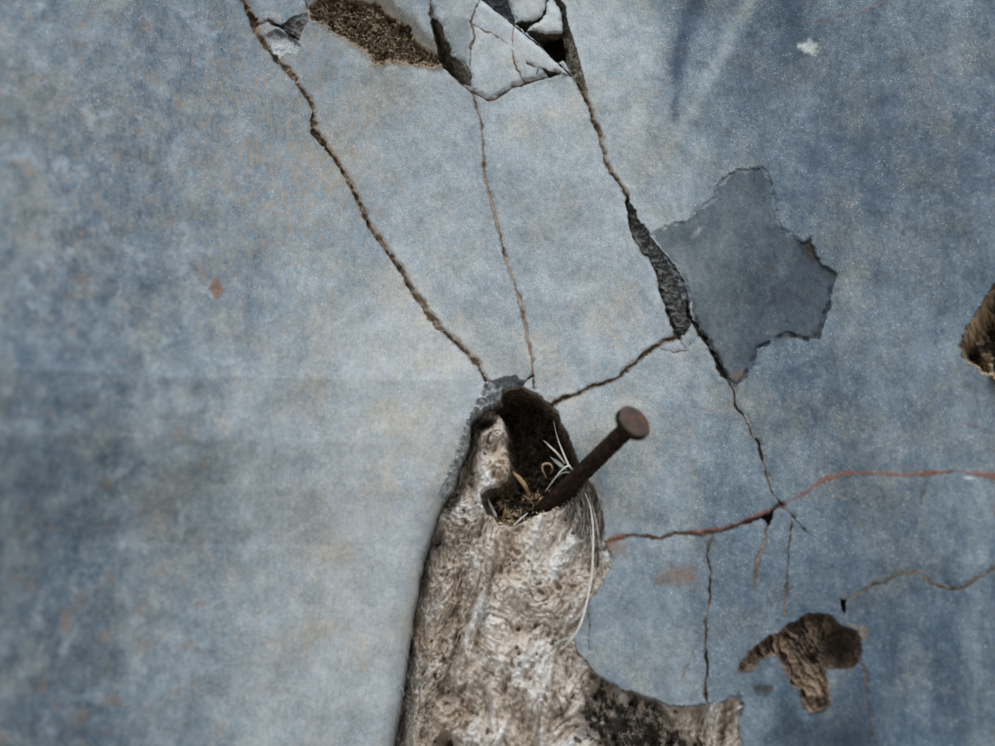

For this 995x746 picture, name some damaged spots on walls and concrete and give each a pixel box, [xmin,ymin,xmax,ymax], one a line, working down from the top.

spalling [266,0,445,71]
crack [241,0,488,382]
spalling [627,165,837,387]
crack [429,0,808,702]
spalling [438,376,525,502]
crack [840,482,995,614]
spalling [737,613,862,714]